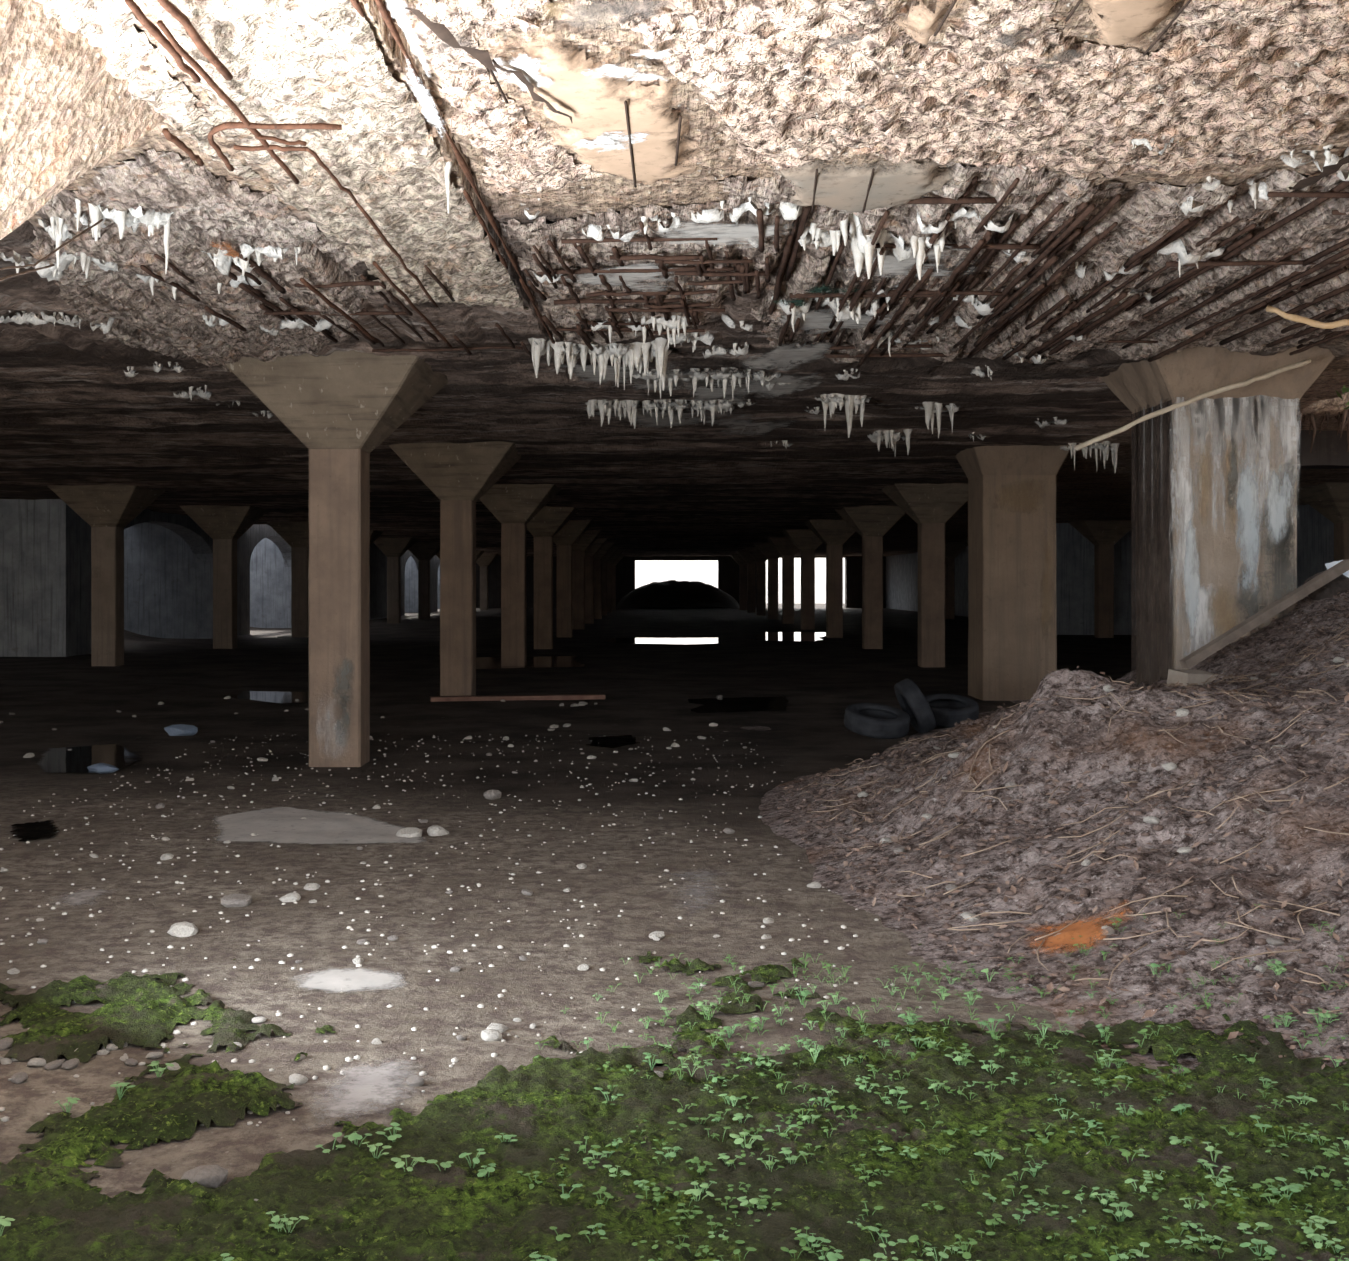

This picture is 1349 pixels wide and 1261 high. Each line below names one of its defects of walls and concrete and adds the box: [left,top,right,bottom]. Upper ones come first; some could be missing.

rust [350,0,555,344]
spalling [24,0,1349,373]
water stain [0,199,176,300]
water stain [201,243,301,294]
water stain [0,310,114,334]
water stain [202,315,228,327]
water stain [259,318,333,336]
water stain [528,196,1039,455]
water stain [1004,349,1048,364]
water stain [1060,395,1299,686]